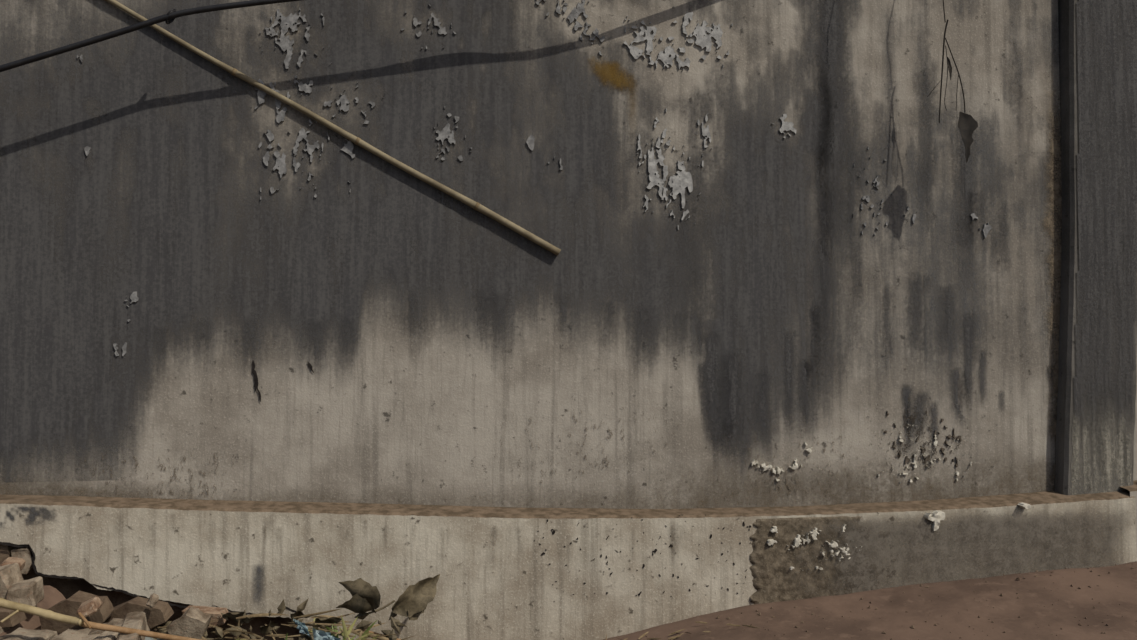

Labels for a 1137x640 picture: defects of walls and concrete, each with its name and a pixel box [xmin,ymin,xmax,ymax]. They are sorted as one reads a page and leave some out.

peeling [255,6,355,200]
peeling [324,82,386,124]
peeling [637,108,712,230]
damp [0,0,1051,484]
crack [252,360,261,402]
spalling [696,516,862,604]